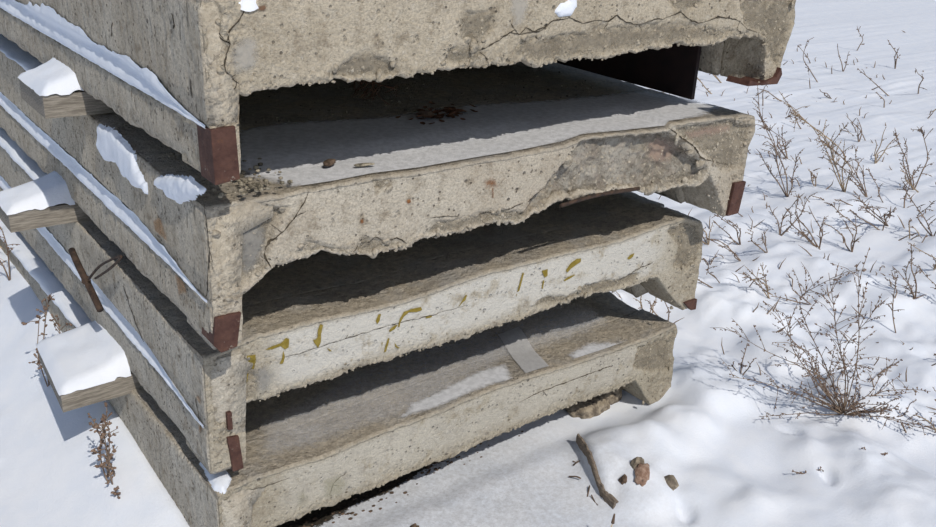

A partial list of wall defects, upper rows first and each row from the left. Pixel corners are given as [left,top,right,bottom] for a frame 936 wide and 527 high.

crack [219,12,244,89]
crack [469,11,762,59]
crack [669,128,728,166]
crack [264,194,308,269]
rust [68,248,123,312]